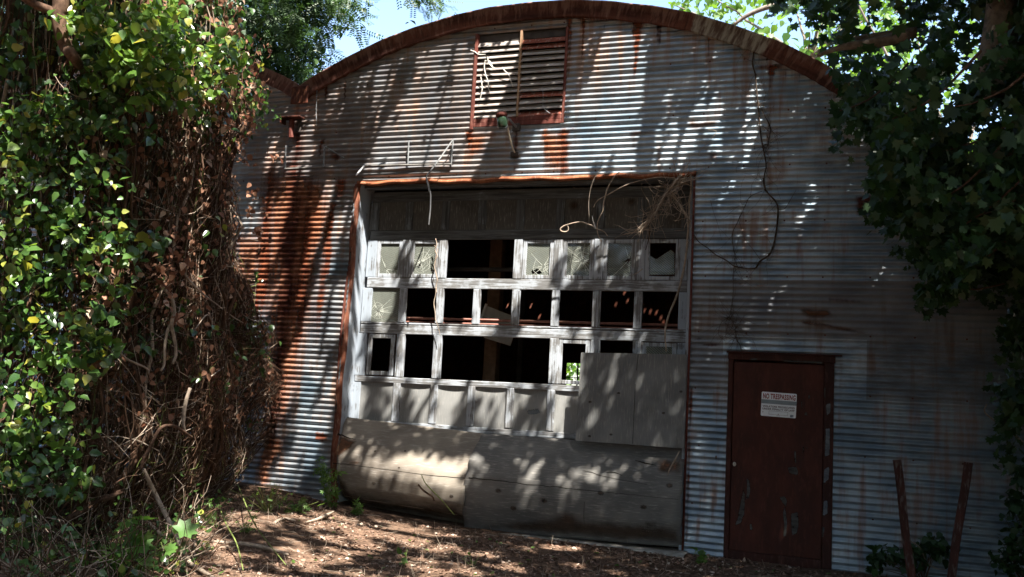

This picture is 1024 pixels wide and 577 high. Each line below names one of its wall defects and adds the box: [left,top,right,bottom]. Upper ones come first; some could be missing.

rust [628,22,642,72]
rust [466,130,482,154]
rust [544,129,568,173]
rust [239,128,345,484]